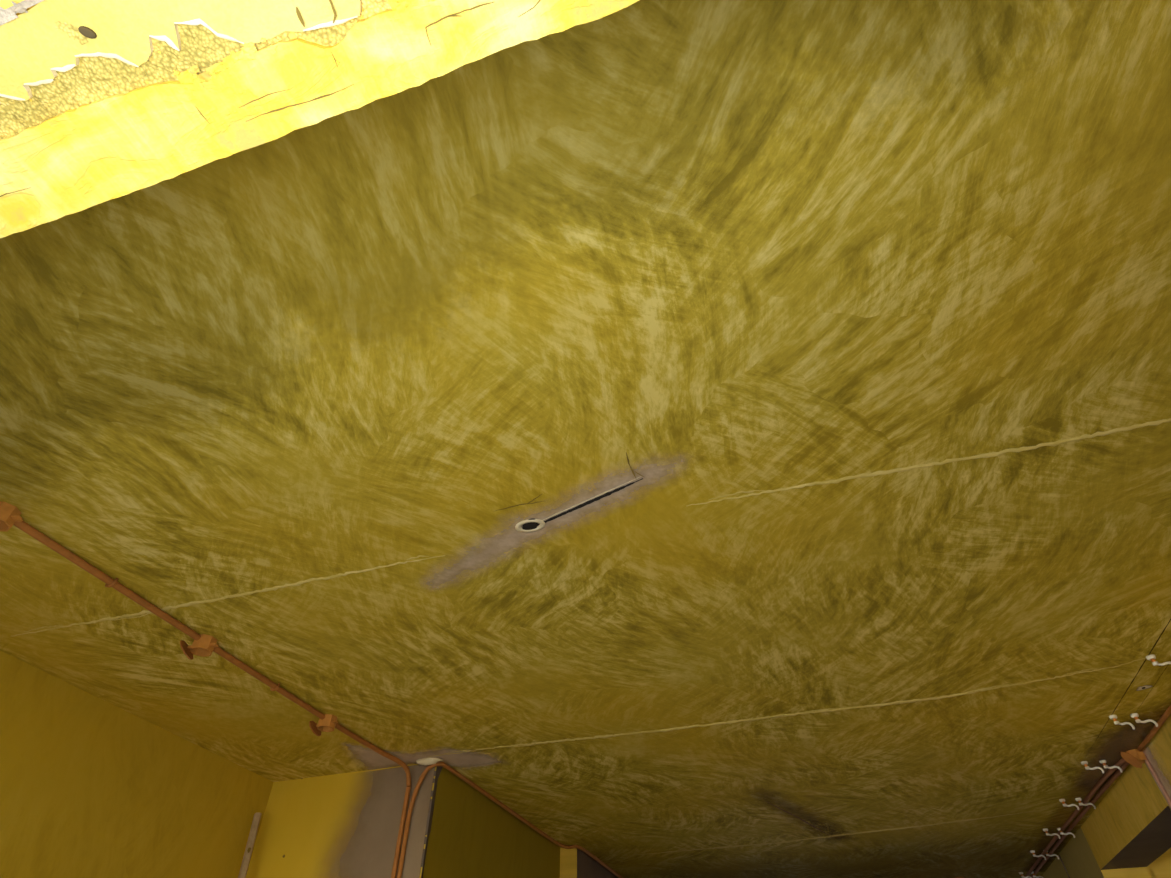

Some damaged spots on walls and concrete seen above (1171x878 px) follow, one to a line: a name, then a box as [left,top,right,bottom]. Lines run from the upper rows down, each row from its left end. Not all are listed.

crack [425,2,494,45]
flaking render [0,15,361,140]
crack [239,52,354,121]